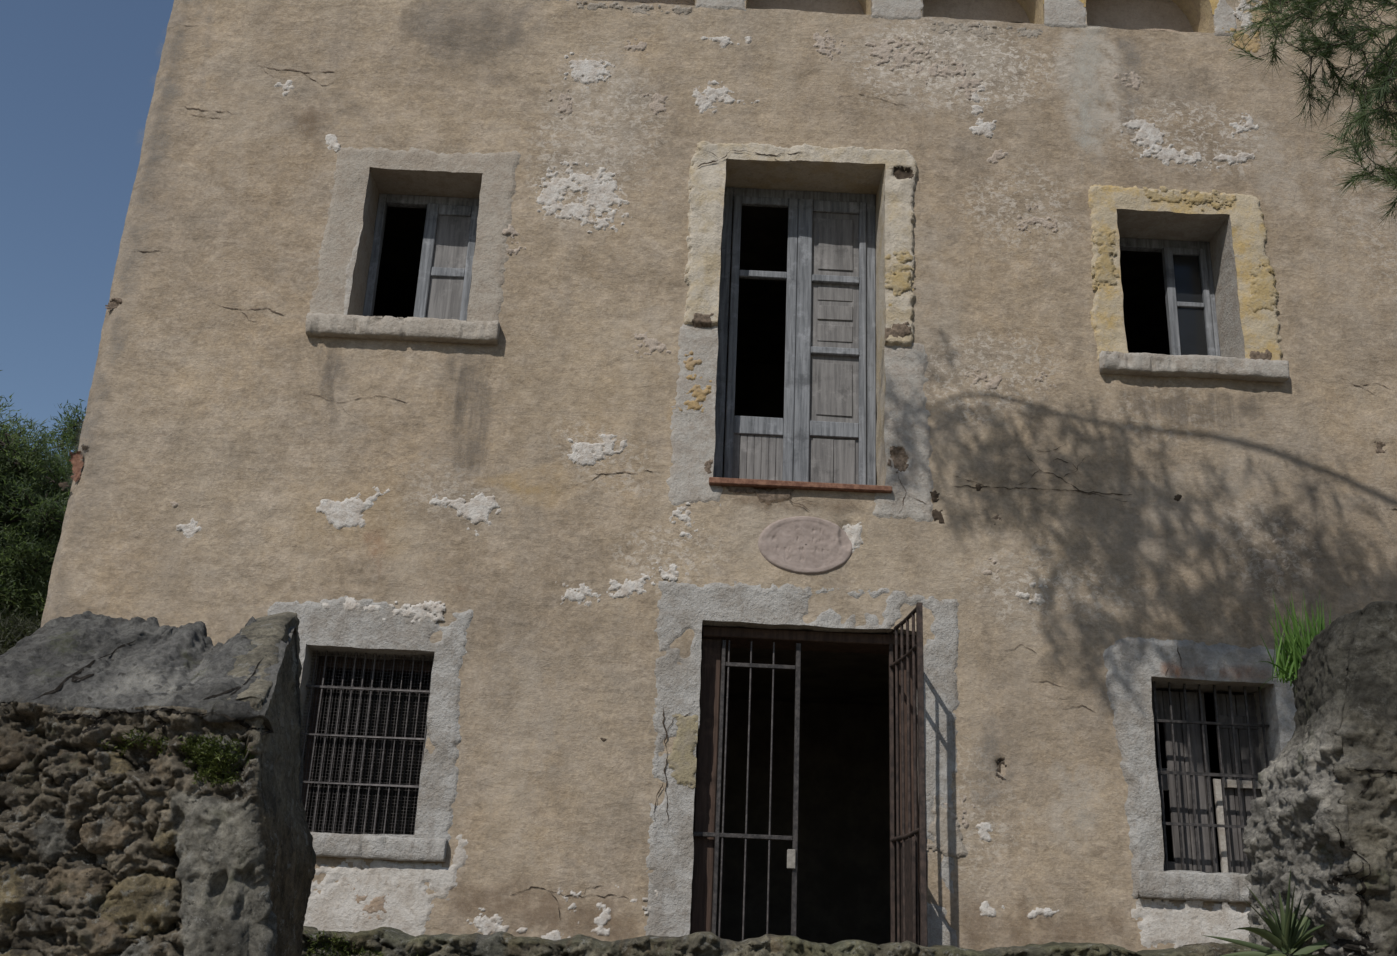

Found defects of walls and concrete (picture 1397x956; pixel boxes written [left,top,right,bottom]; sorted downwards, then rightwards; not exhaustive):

peeling [548,38,648,120]
peeling [692,80,760,114]
peeling [1120,113,1259,171]
peeling [529,160,632,233]
peeling [567,434,628,466]
crack [955,446,1132,502]
peeling [316,486,390,529]
peeling [429,489,501,536]
peeling [322,597,446,623]
peeling [555,562,689,606]
crack [654,709,693,822]
peeling [303,834,468,936]